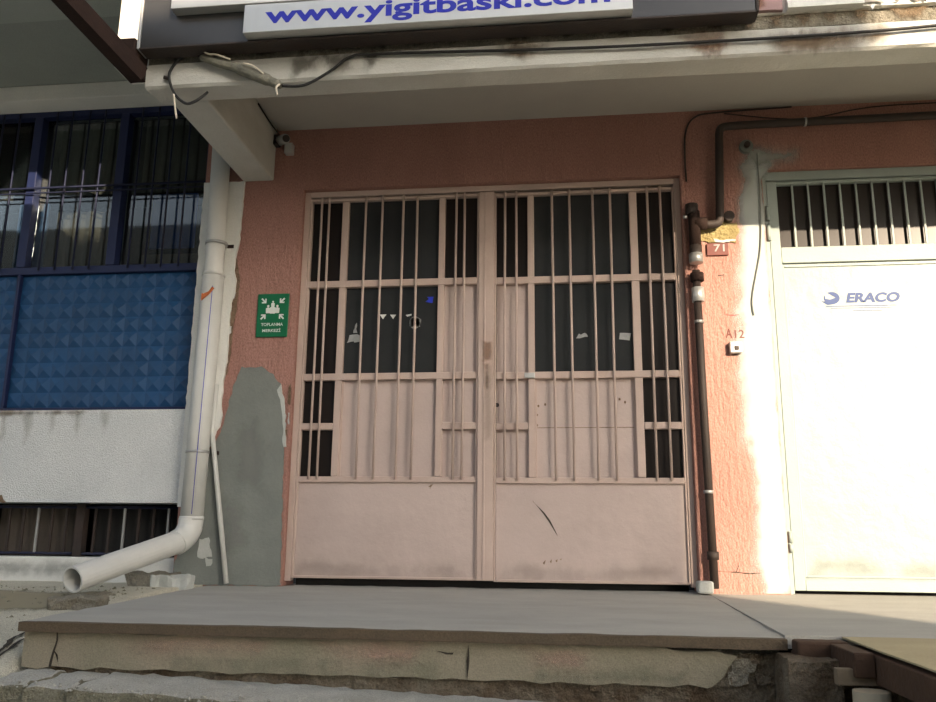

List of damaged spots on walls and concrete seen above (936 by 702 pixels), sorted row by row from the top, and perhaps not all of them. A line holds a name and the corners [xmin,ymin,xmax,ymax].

damp [772,32,881,48]
crack [0,632,25,656]
crack [49,633,58,667]